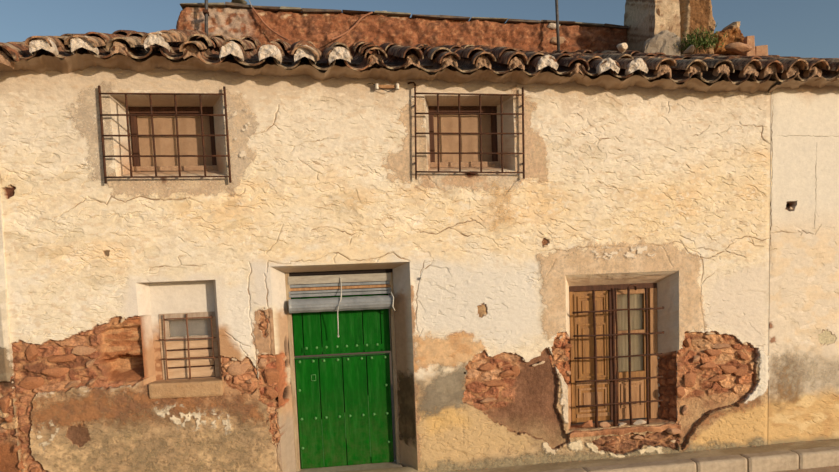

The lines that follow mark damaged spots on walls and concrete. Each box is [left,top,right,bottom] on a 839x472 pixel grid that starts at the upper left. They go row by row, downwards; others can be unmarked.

crack [73,196,200,208]
crack [417,220,480,237]
leakage [0,347,14,382]
flaking render [0,316,144,472]
flaking render [154,404,231,431]
flaking render [221,308,280,446]
flaking render [462,239,771,458]
leakage [771,355,836,402]